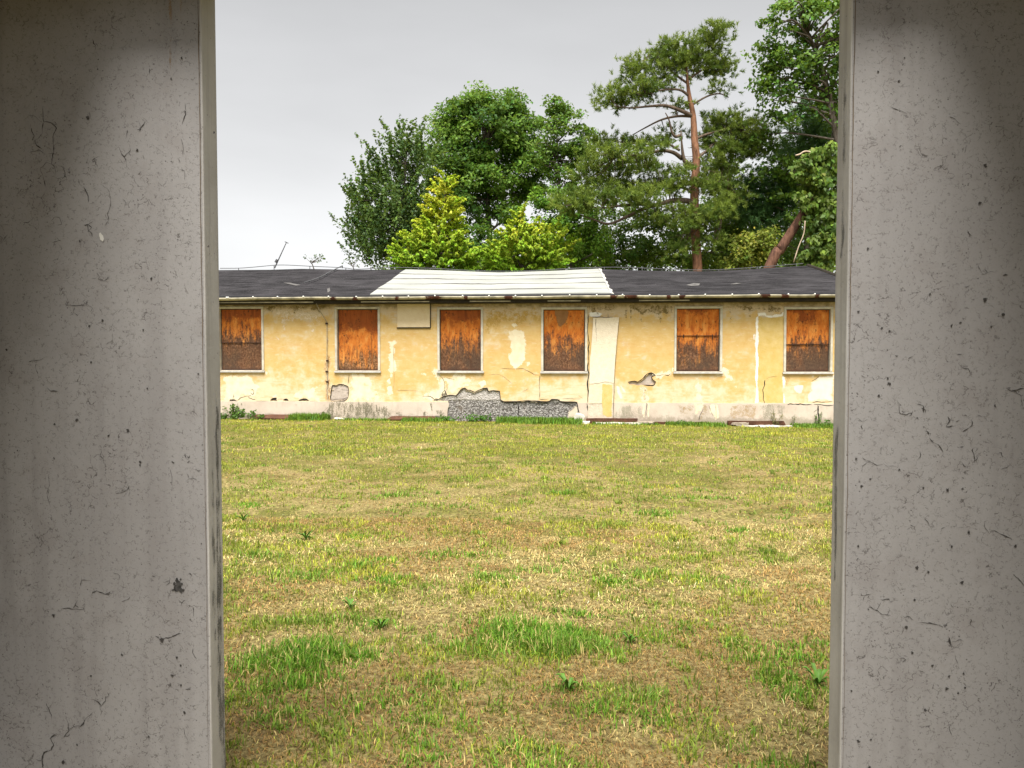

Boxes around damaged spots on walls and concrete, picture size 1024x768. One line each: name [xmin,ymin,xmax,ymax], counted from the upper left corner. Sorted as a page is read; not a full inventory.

peeling [221,340,397,402]
flaking render [421,369,579,421]
peeling [508,323,530,370]
flaking render [616,372,656,399]